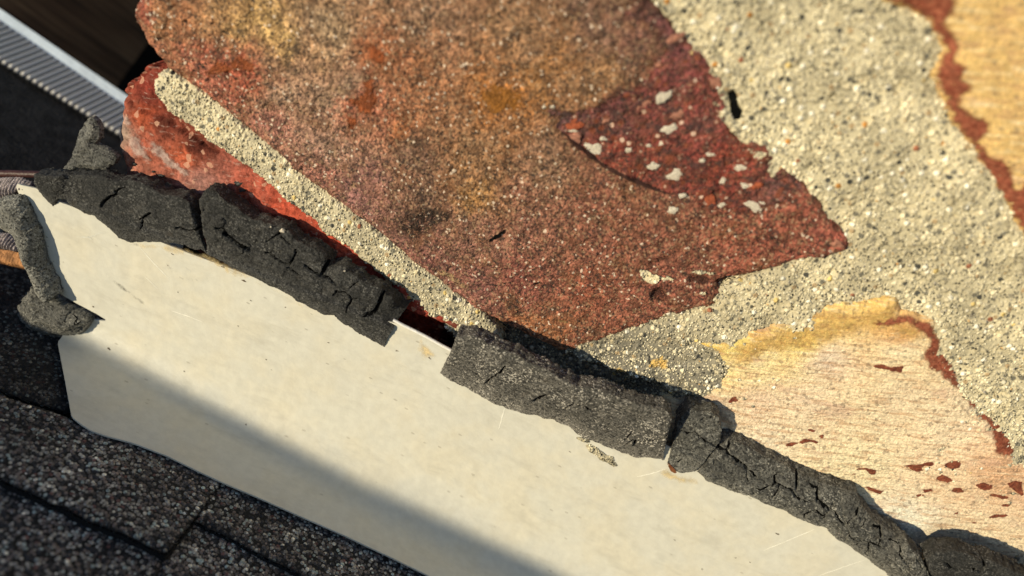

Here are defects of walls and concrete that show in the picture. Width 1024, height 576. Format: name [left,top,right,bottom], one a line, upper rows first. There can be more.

spalling [542,0,804,215]
crack [181,226,385,318]
spalling [689,270,715,295]
crack [685,416,903,570]